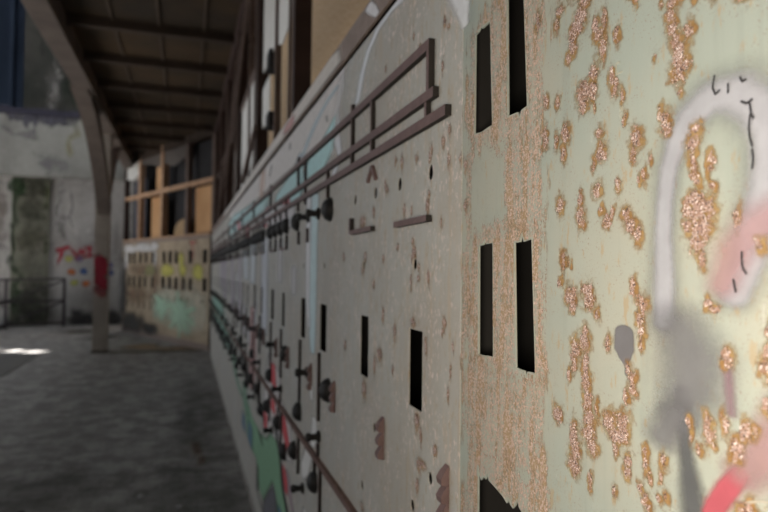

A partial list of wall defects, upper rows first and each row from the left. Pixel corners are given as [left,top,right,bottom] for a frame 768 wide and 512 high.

leakage [0,69,78,140]
rust [657,102,674,138]
rust [681,118,720,274]
rust [428,0,671,512]
rust [703,293,722,314]
rust [719,345,735,372]